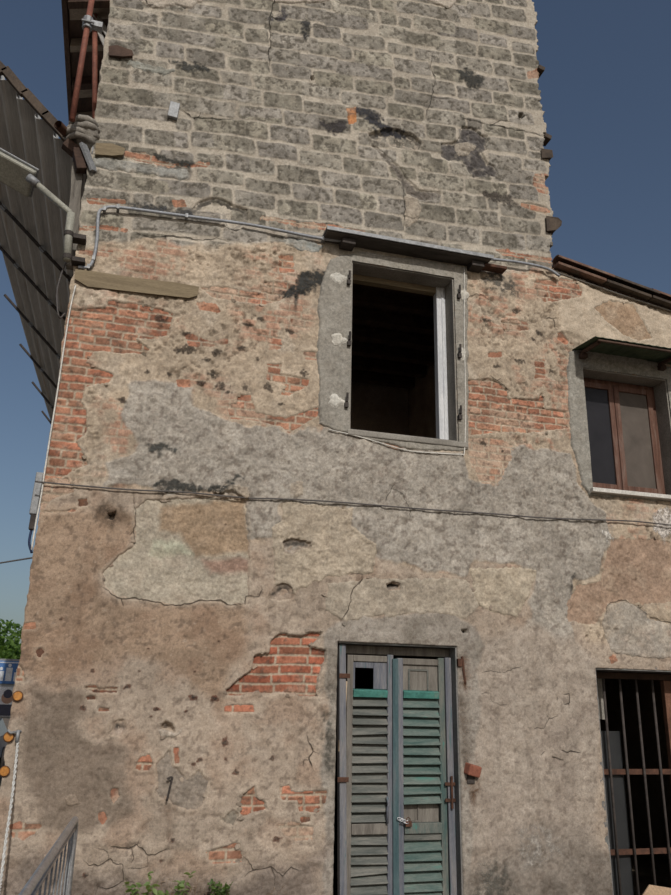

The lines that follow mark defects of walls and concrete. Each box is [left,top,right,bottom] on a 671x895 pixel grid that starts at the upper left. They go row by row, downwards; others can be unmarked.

crack [268,0,281,66]
water stain [458,67,485,89]
water stain [319,120,347,135]
water stain [356,107,406,139]
water stain [282,269,325,303]
spalling [38,301,173,523]
spalling [167,332,318,433]
spalling [468,379,570,445]
peeling [102,497,249,605]
spalling [211,628,324,713]
crack [86,841,166,895]
crack [243,856,306,885]